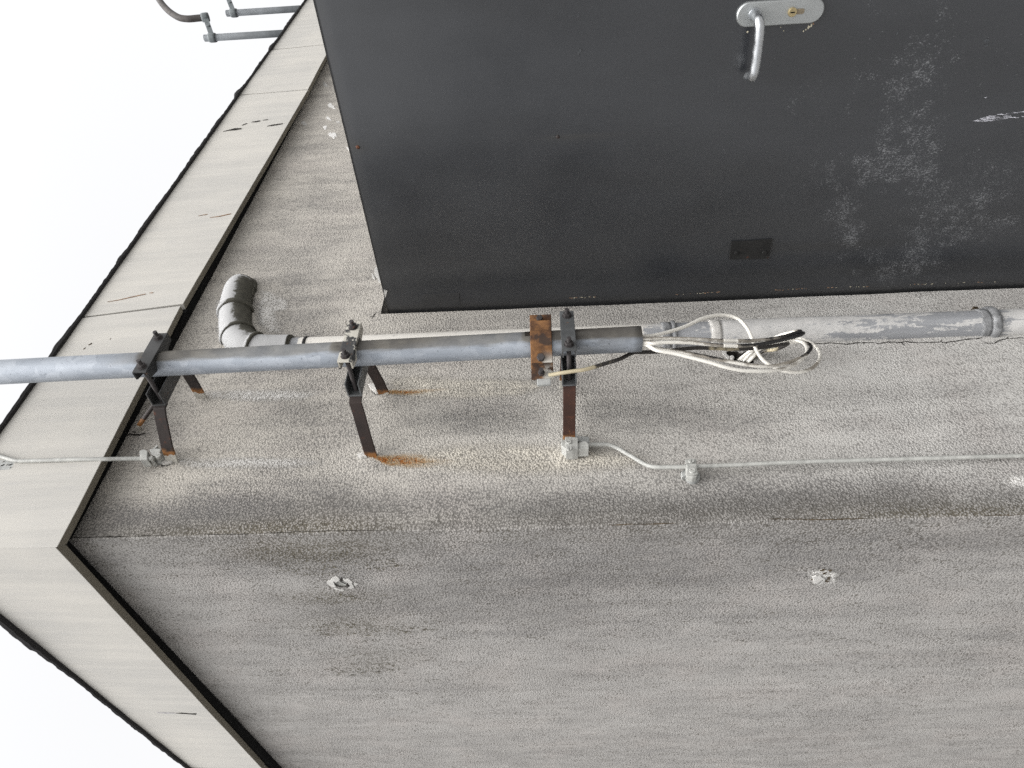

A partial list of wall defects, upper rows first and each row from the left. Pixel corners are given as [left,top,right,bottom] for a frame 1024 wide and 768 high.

corrosion [373,456,427,465]
flaking render [327,576,359,591]
flaking render [811,568,832,584]